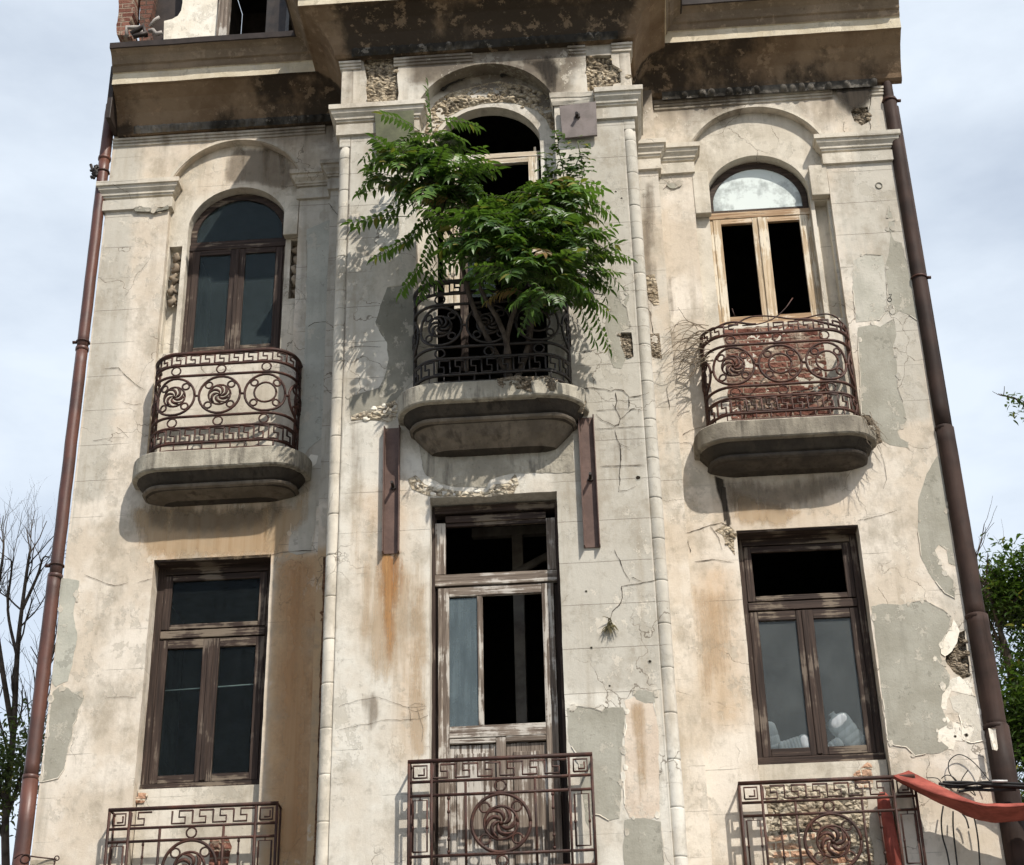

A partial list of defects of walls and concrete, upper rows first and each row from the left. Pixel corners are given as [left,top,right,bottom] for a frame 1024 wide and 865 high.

water stain [833,86,873,108]
peeling [852,207,918,448]
crack [584,387,670,492]
corrosion [381,554,398,650]
crack [611,552,654,616]
peeling [917,456,956,599]
peeling [39,578,84,782]
peeling [871,598,986,758]
peeling [567,689,664,865]